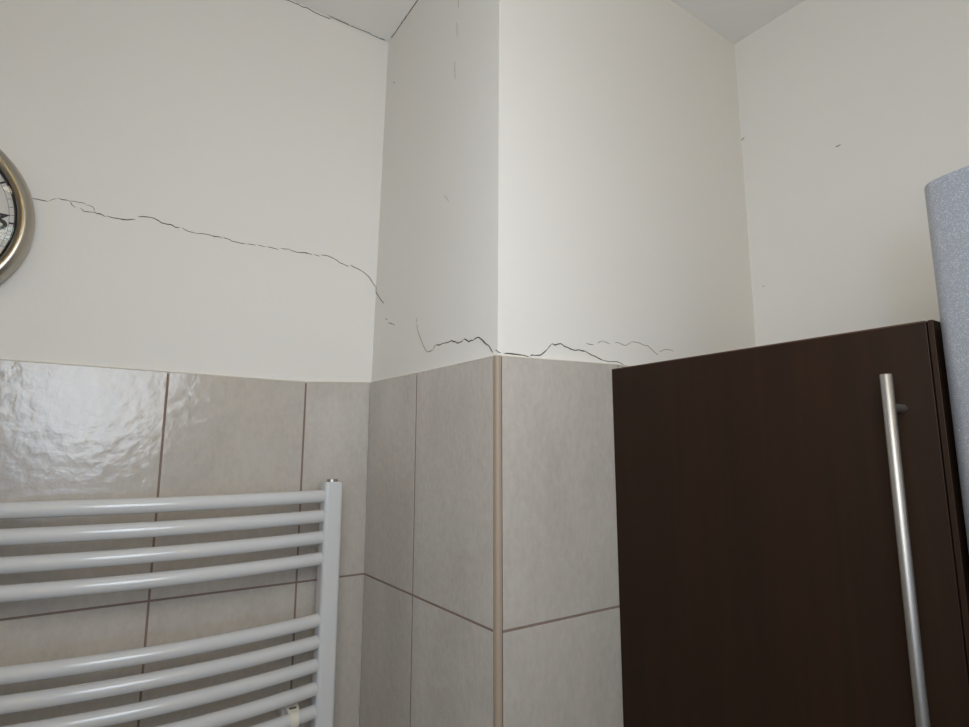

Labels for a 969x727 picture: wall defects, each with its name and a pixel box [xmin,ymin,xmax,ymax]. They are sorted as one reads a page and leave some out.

crack [287,0,418,40]
crack [33,198,672,365]